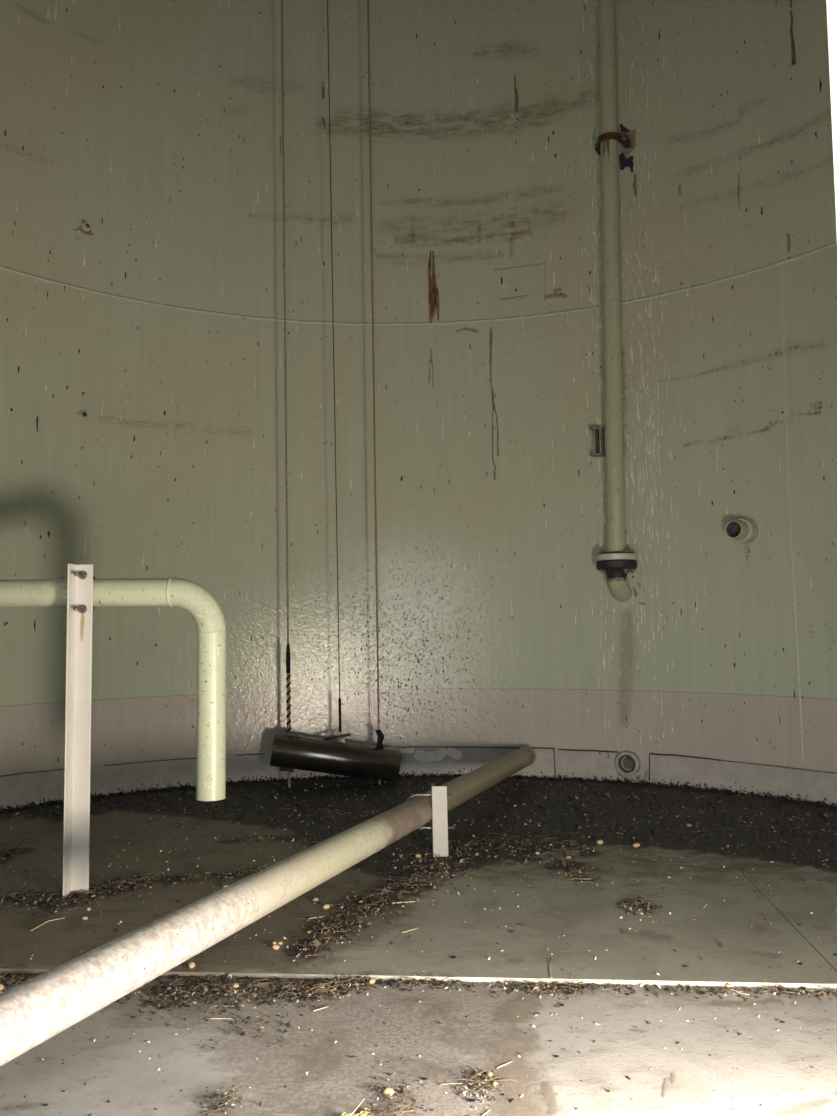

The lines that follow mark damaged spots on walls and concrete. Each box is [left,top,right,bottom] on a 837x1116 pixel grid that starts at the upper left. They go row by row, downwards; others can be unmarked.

corrosion [428,251,439,323]
corrosion [456,328,499,480]